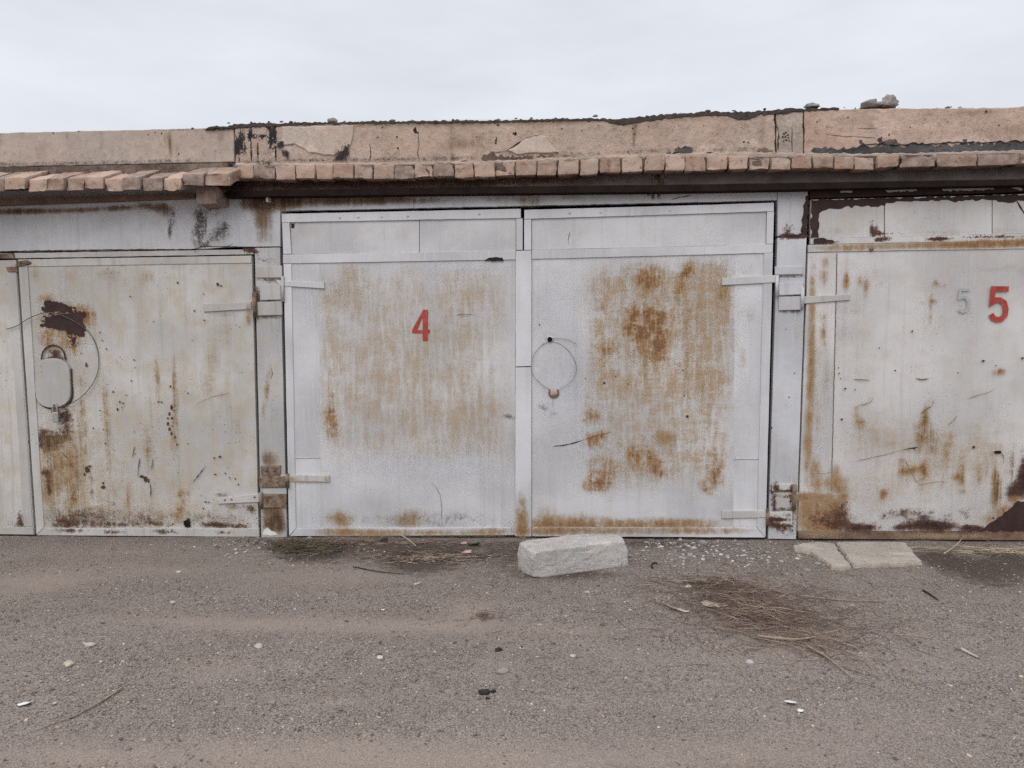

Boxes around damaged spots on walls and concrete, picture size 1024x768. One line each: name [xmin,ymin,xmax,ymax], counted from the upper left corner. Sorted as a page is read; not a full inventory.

water stain [194,208,228,248]
peeling [799,187,1024,244]
rust [39,295,95,360]
rust [583,262,733,494]
rust [769,220,1024,538]
rust [325,394,338,437]
rust [38,400,189,534]
rust [200,515,247,534]
rust [218,493,285,533]
rust [324,500,735,537]